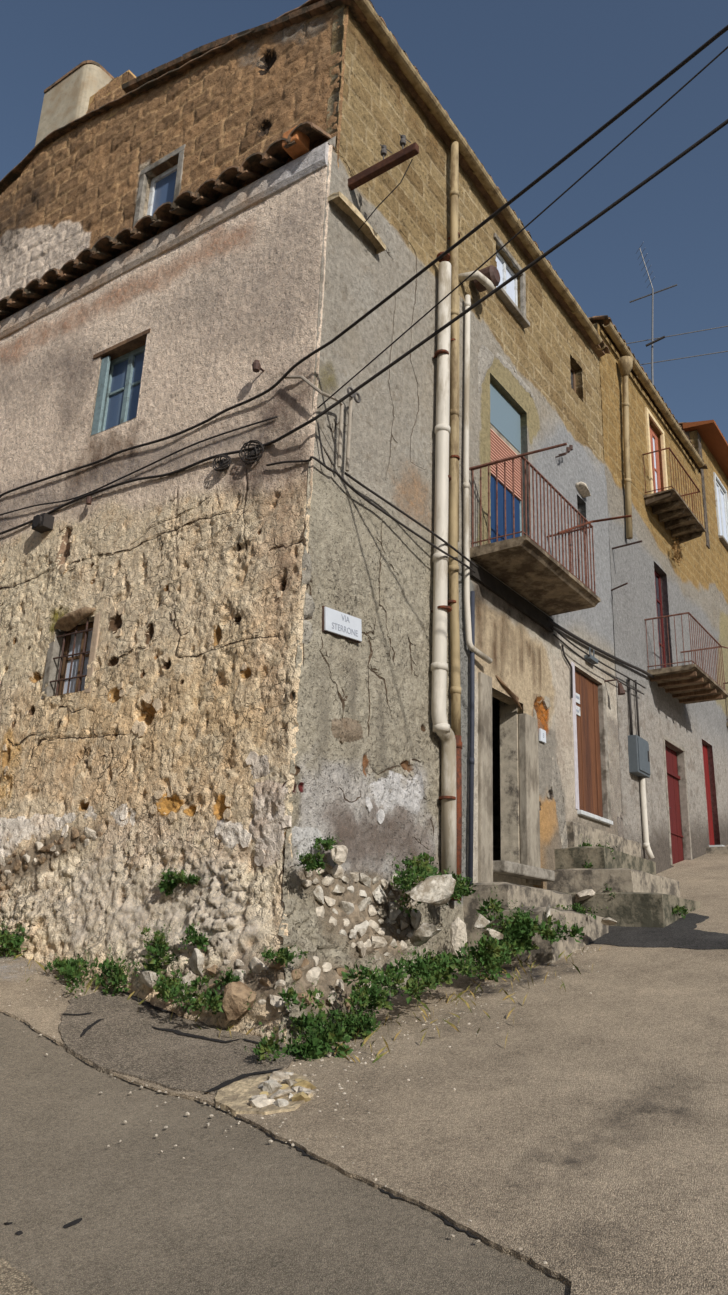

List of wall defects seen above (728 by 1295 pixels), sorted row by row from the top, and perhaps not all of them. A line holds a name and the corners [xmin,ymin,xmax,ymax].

spalling [55,521,75,574]
spalling [108,606,125,637]
crack [0,459,417,736]
spalling [209,616,241,648]
spalling [2,743,11,776]
crack [8,700,137,779]
spalling [107,682,125,703]
spalling [132,622,171,737]
spalling [240,662,251,679]
rust [534,703,548,732]
crack [340,759,434,848]
peeling [362,755,425,824]